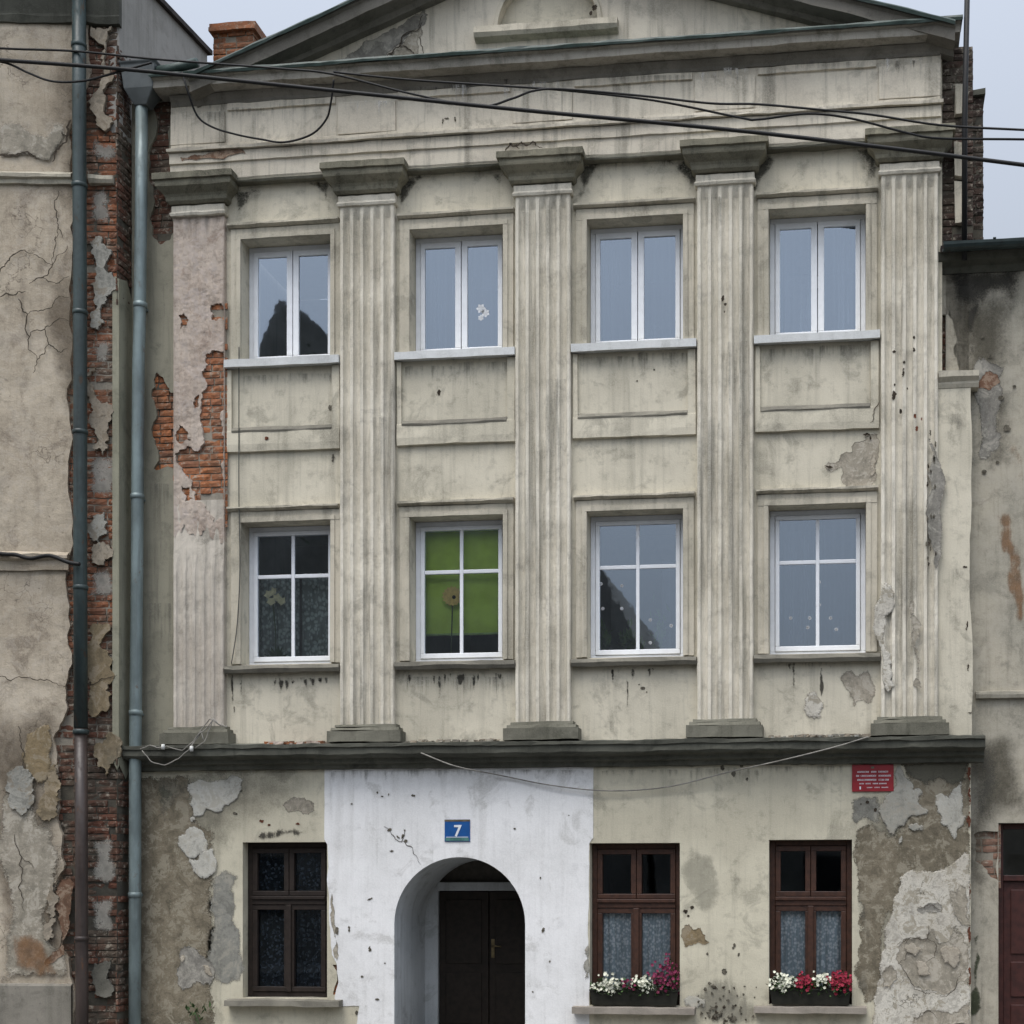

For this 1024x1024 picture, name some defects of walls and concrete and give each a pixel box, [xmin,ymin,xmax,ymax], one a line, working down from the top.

peeling [87,26,115,132]
crack [387,15,424,56]
crack [0,191,69,373]
peeling [90,236,117,331]
peeling [87,512,114,566]
spalling [152,344,228,527]
peeling [825,433,880,486]
spalling [892,336,946,567]
rust [1002,516,1023,618]
peeling [0,725,73,980]
peeling [141,775,244,1024]
peeling [852,763,971,1024]